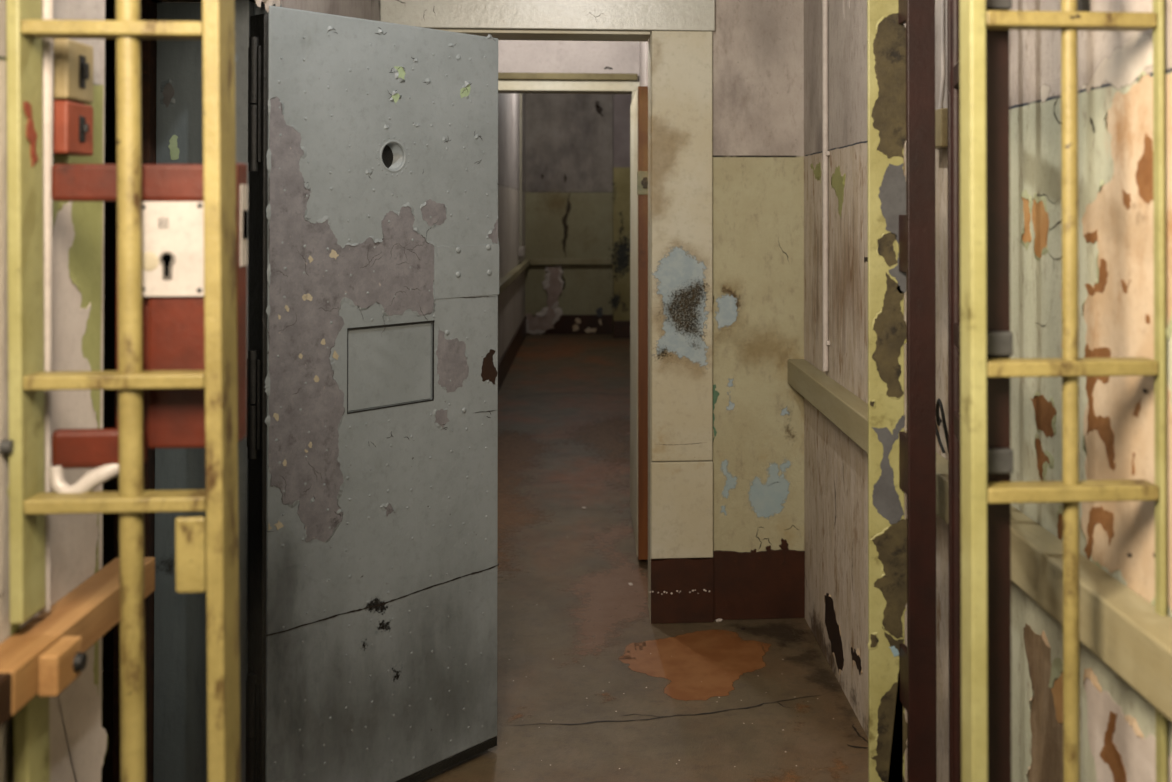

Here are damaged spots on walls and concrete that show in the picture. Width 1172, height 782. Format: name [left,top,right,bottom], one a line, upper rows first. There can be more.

peeling [52,202,91,371]
peeling [264,97,447,543]
crack [541,174,571,290]
peeling [652,246,740,366]
peeling [864,13,906,409]
peeling [1082,71,1172,360]
peeling [51,390,98,485]
peeling [1030,391,1057,481]
peeling [1080,370,1172,612]
peeling [824,415,907,782]
peeling [49,644,108,782]
peeling [1023,623,1063,782]